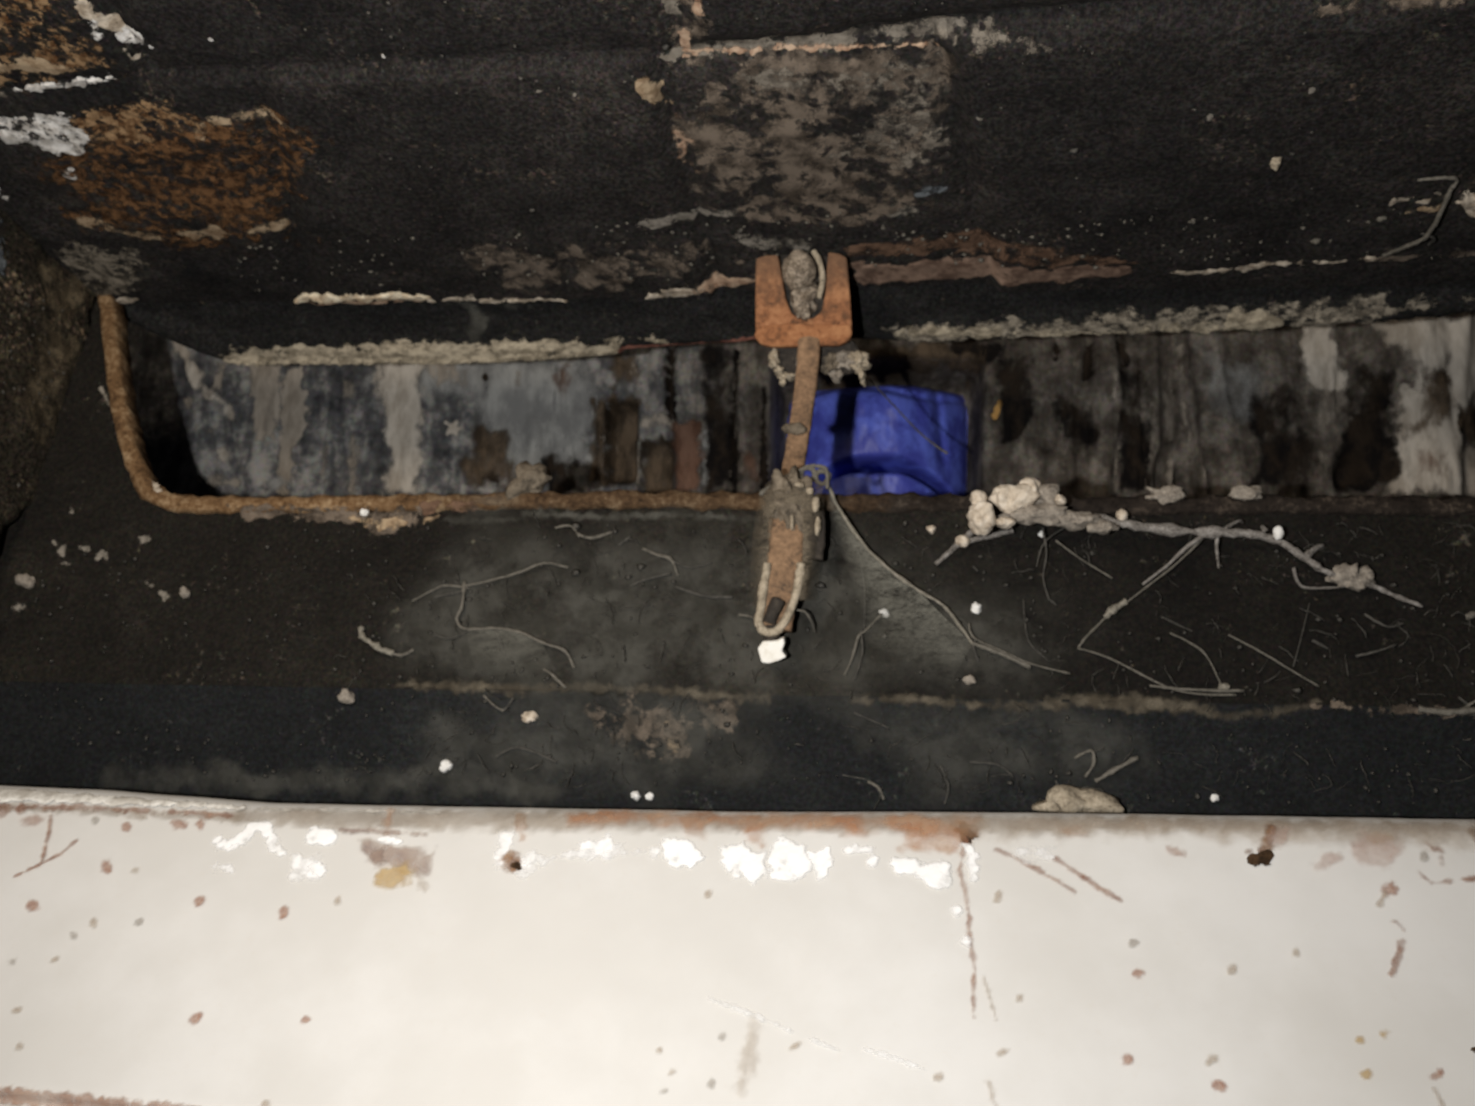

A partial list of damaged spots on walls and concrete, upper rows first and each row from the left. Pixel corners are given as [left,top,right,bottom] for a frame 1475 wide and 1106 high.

flaking render [0,0,153,97]
spalling [217,0,1052,367]
flaking render [24,100,319,445]
damp [172,341,234,420]
damp [249,365,310,497]
damp [344,346,769,496]
damp [1055,336,1173,493]
damp [1250,326,1348,492]
damp [1371,312,1475,496]
rust [345,829,427,887]
rust [494,831,537,878]
rust [0,1087,177,1106]